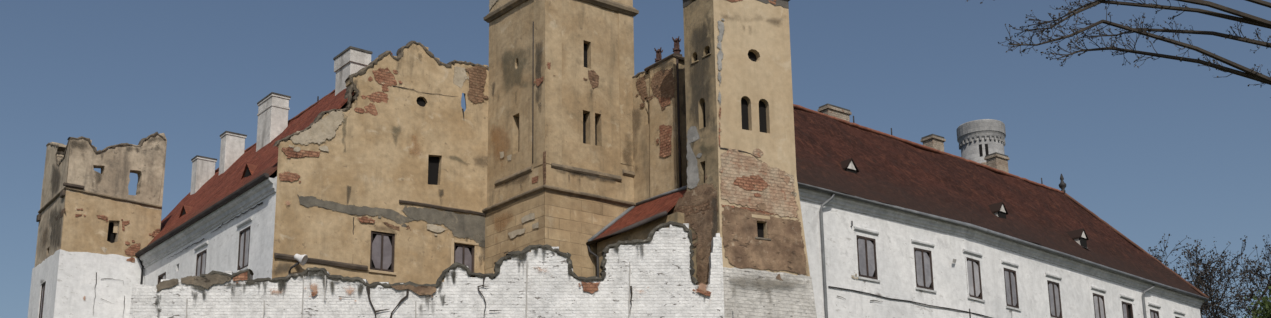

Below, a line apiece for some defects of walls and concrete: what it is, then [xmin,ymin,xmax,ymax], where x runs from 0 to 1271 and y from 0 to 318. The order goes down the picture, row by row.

spalling [156,18,807,301]